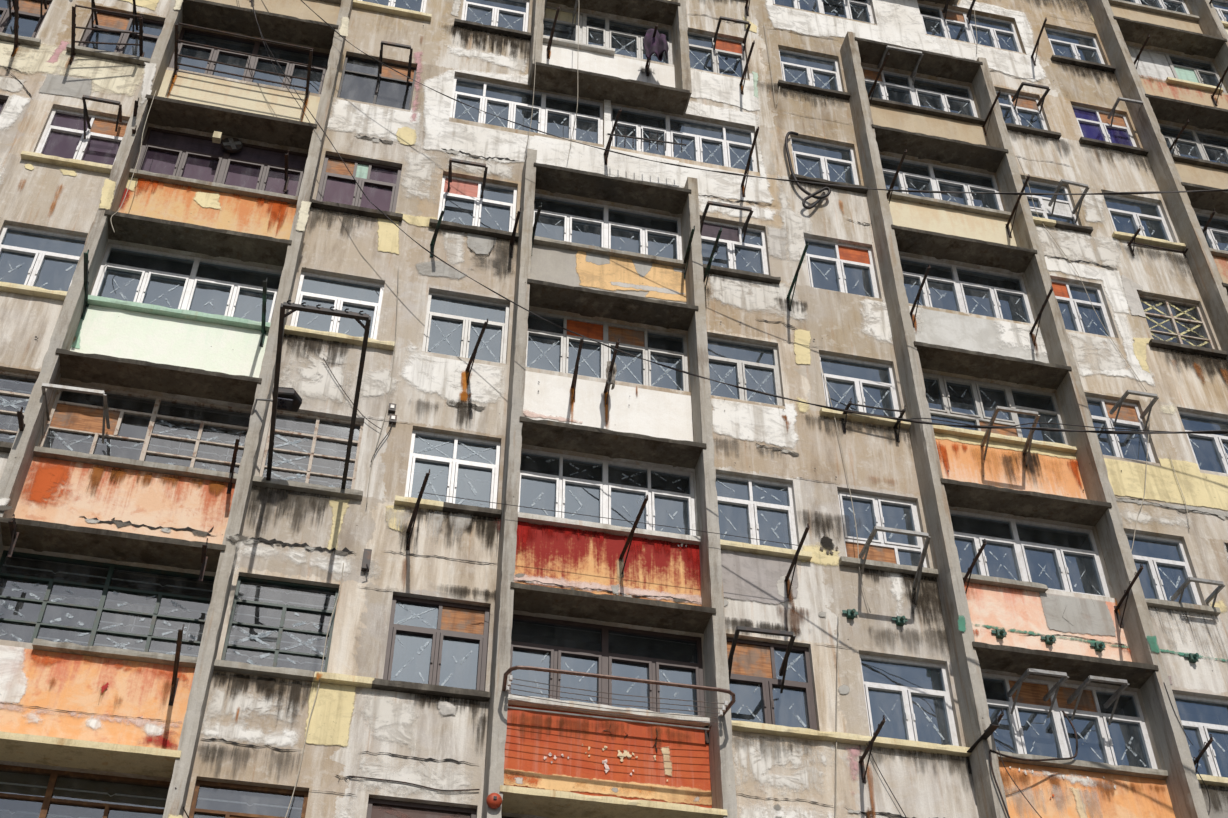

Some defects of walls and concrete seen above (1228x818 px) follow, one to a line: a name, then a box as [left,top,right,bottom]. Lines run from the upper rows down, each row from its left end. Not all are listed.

peeling [327,45,811,263]
rust [137,178,191,193]
rust [257,198,288,233]
rust [459,371,471,402]
rust [936,442,967,474]
rust [88,465,225,495]
water stain [248,486,330,530]
rust [517,521,701,576]
water stain [861,568,884,581]
water stain [902,573,943,623]
water stain [725,607,809,634]
peeling [504,744,712,805]